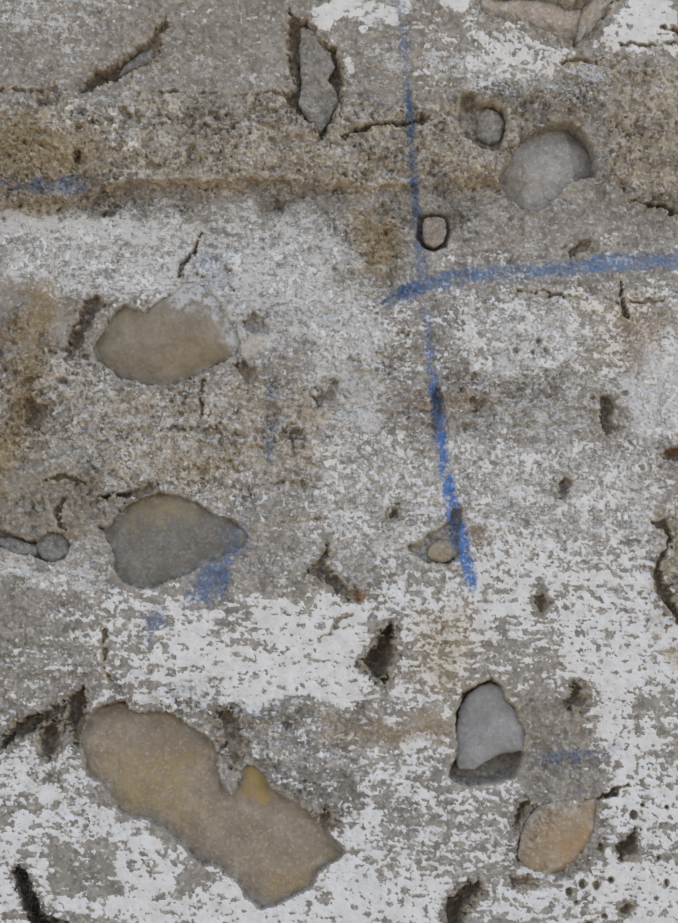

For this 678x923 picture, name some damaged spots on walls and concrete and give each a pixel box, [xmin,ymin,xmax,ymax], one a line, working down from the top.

crack [174,229,235,292]